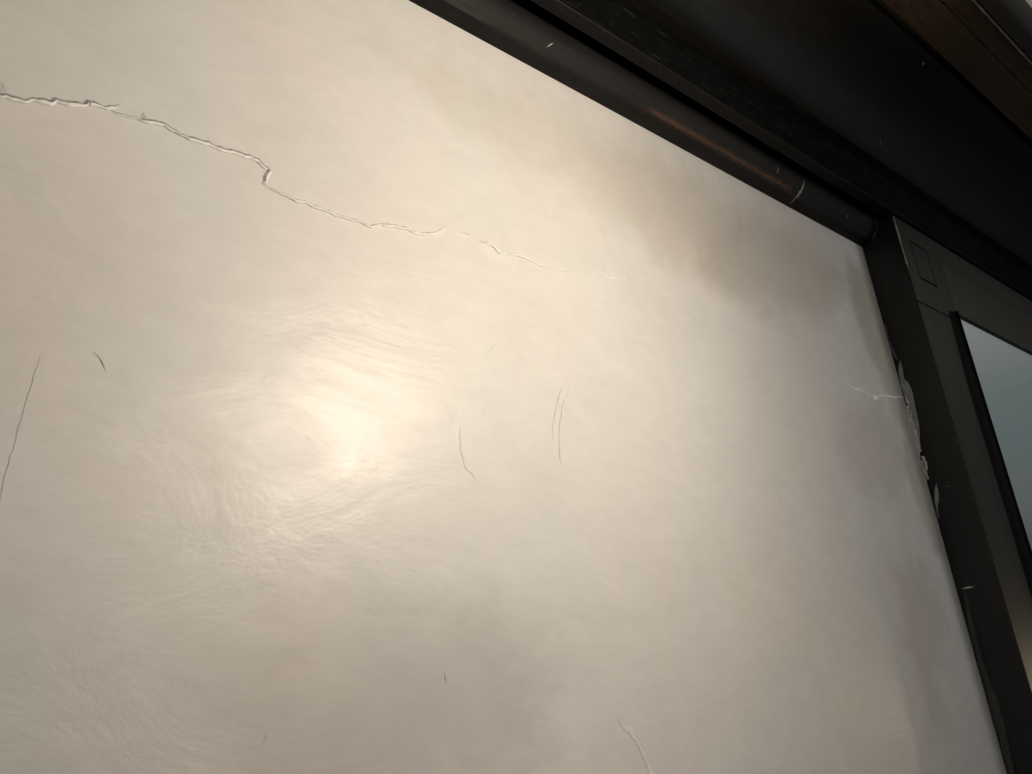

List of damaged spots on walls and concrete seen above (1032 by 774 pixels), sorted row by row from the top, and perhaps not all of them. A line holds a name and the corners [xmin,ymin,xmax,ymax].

crack [0,82,573,273]
peeling [885,325,948,518]